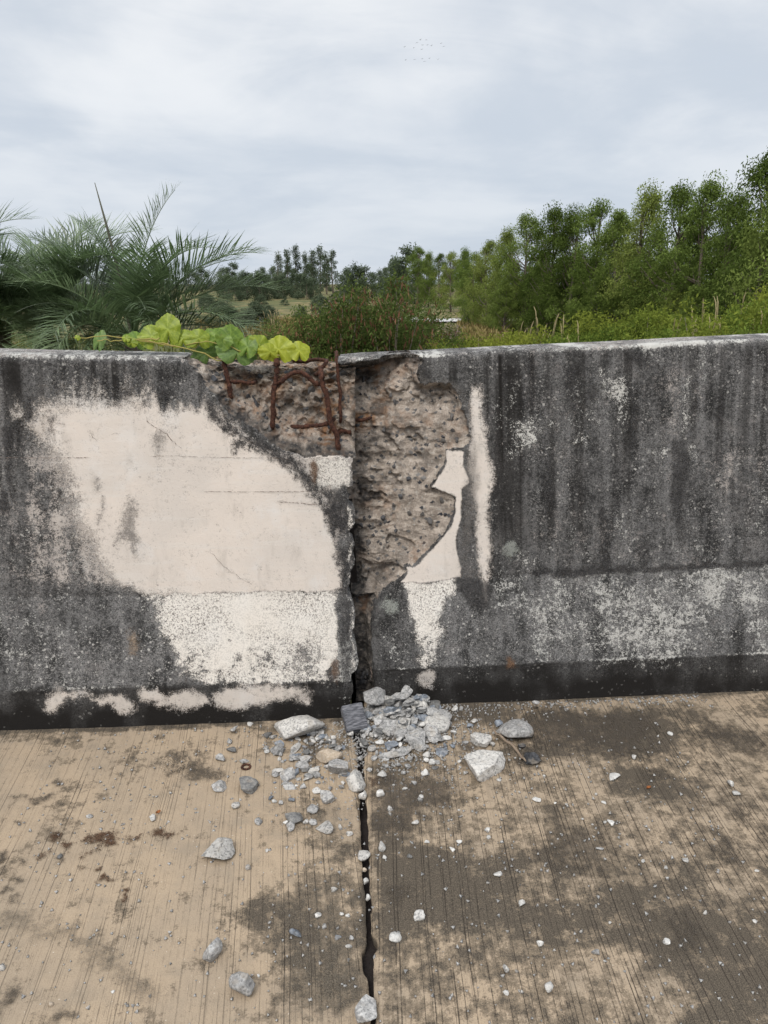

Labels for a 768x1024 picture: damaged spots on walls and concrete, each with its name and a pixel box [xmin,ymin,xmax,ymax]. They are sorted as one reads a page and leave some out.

corrosion [221,361,258,399]
corrosion [270,350,372,450]
leakage [0,396,33,514]
leakage [116,497,139,552]
peeling [12,350,495,715]
leakage [202,388,354,537]
leakage [332,546,357,689]
leakage [454,577,493,609]
leakage [530,509,768,578]
leakage [668,439,691,546]
crack [348,499,377,1024]